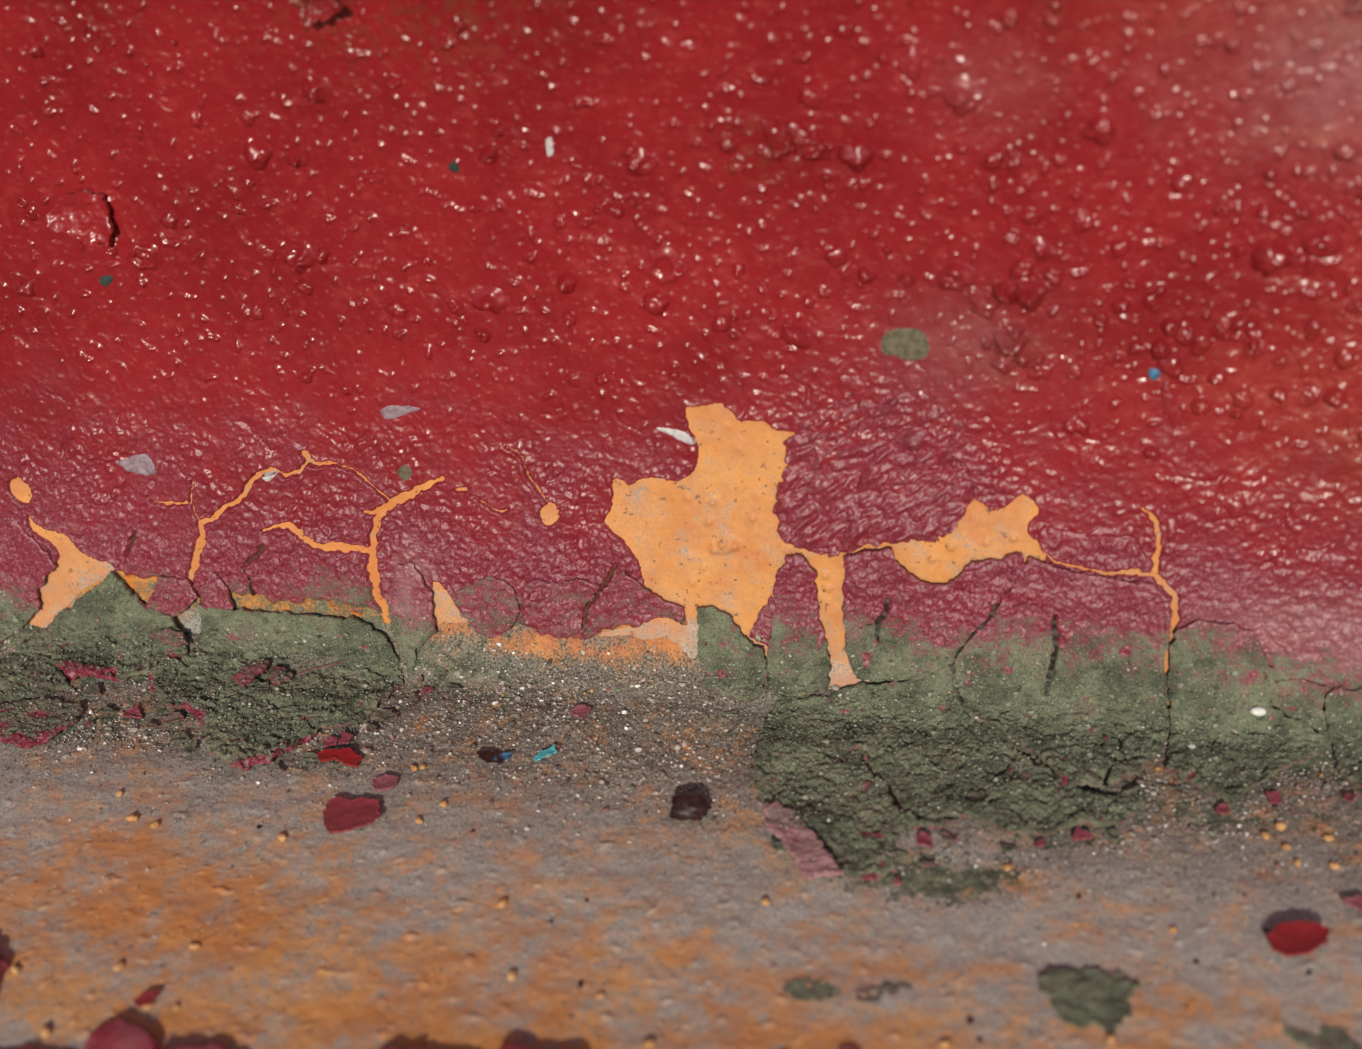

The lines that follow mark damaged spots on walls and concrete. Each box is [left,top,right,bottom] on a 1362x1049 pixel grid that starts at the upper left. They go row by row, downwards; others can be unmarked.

crack [507,446,548,501]
crack [129,531,137,554]
crack [154,460,507,625]
peeling [0,390,1362,881]
crack [866,599,889,643]
crack [1023,507,1179,710]
crack [951,603,999,724]
crack [993,748,1056,780]
crack [1102,738,1127,787]
peeling [0,954,10,982]
peeling [133,990,159,1008]
peeling [84,1017,227,1049]